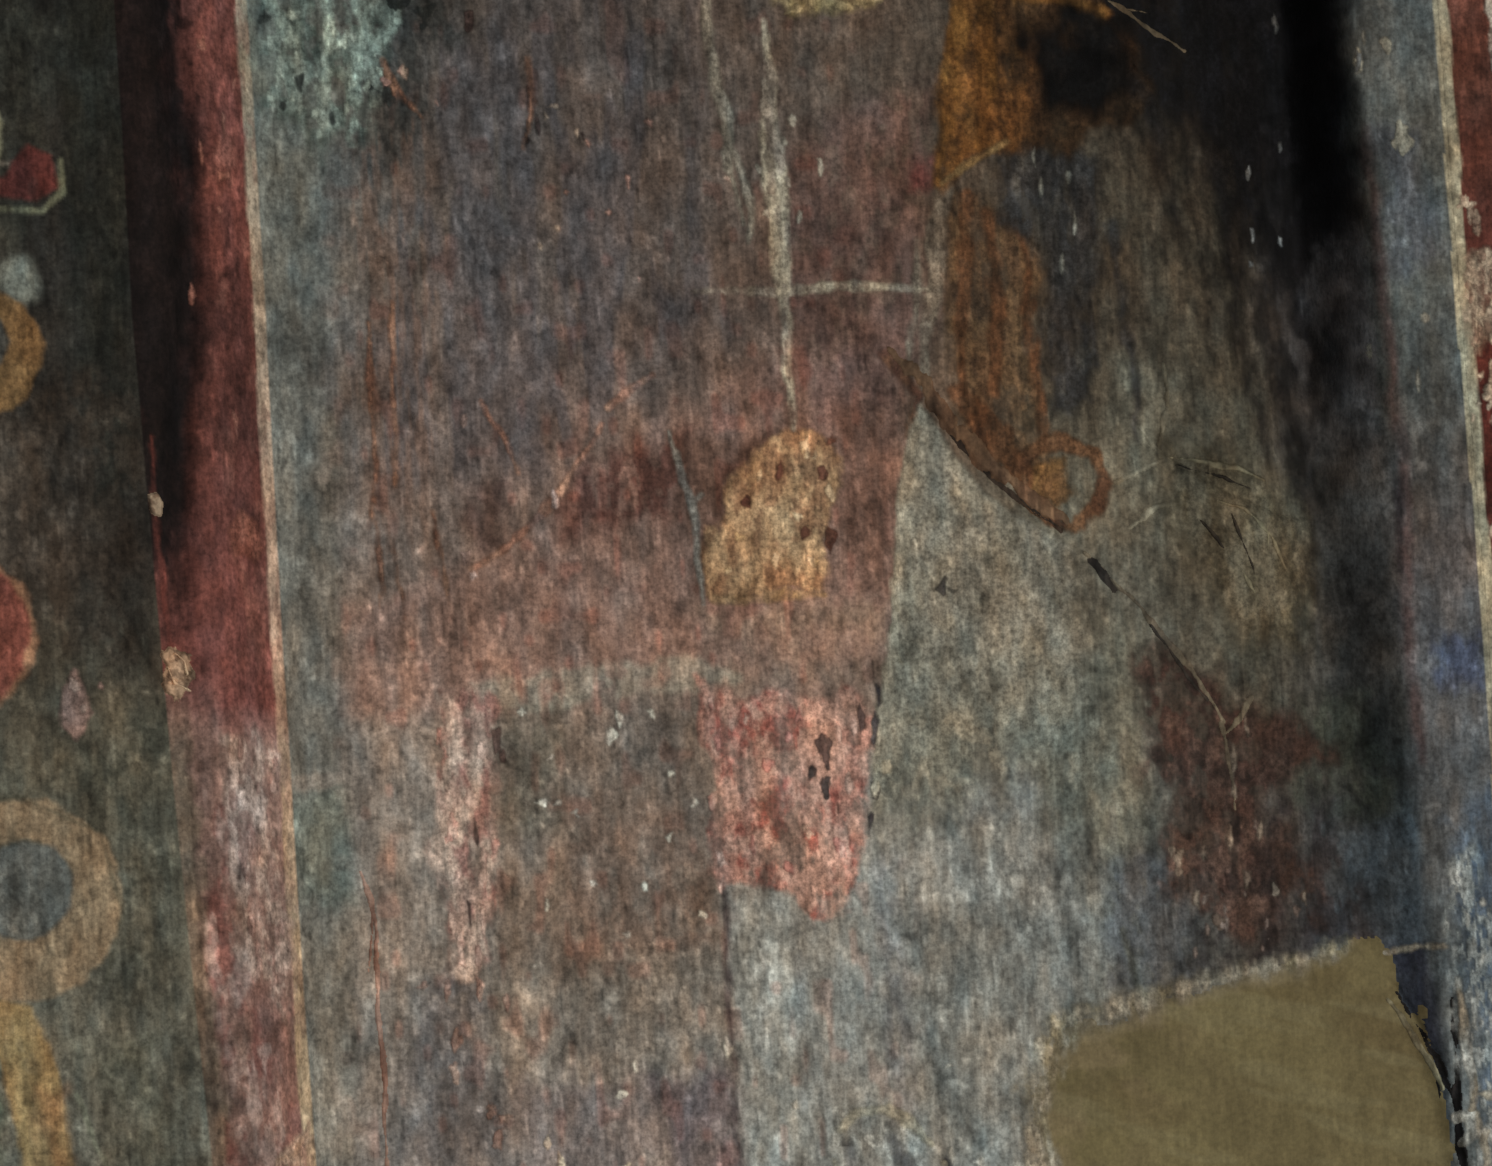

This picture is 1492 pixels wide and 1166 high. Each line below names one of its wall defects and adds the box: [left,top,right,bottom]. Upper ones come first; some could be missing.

peeling [1457,196,1492,421]
crack [878,347,1254,810]
crack [1395,991,1468,1166]